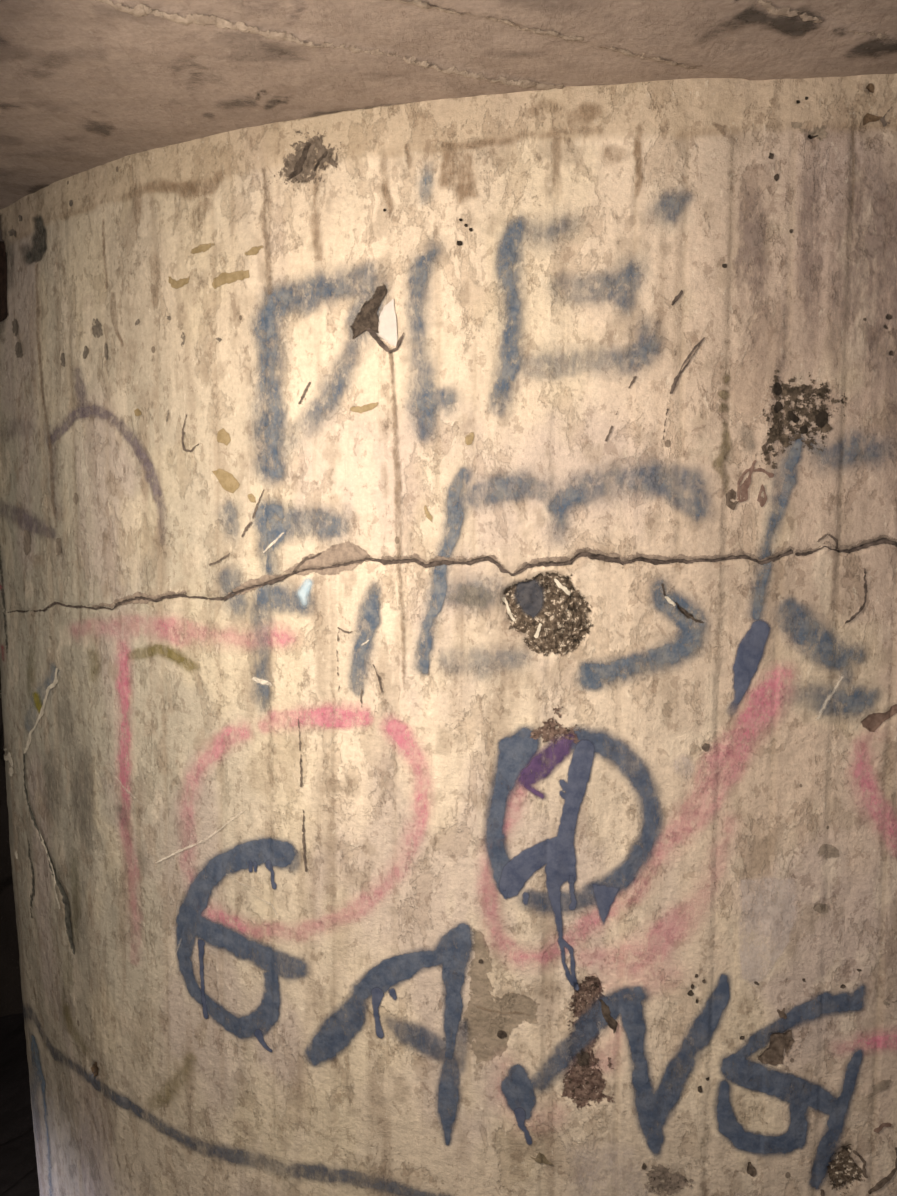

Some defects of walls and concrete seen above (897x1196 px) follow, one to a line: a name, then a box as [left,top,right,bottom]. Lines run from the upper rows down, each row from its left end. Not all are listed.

spalling [268,130,344,190]
spalling [0,215,46,358]
crack [35,266,54,492]
spalling [83,318,108,360]
spalling [350,284,404,353]
spalling [726,370,847,510]
crack [0,337,897,707]
spalling [502,572,593,659]
crack [23,668,75,954]
spalling [562,975,617,1112]
spalling [642,1163,694,1196]
spalling [821,1144,897,1196]